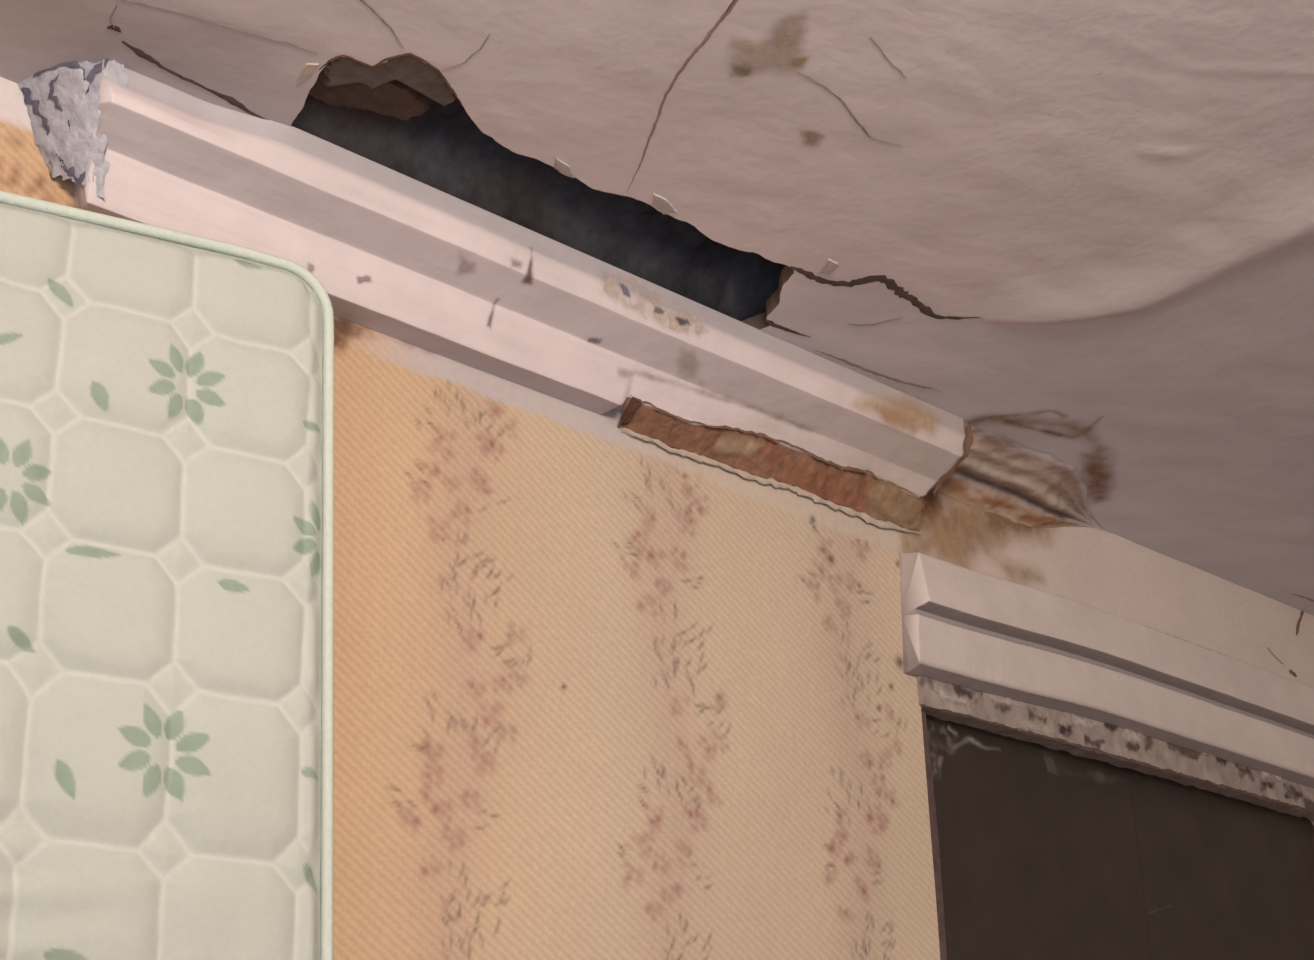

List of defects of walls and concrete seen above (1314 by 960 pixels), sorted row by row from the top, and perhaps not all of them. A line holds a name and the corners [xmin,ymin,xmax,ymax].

flaking render [18,58,128,200]
crack [107,0,317,120]
crack [360,0,404,49]
crack [442,34,490,70]
crack [627,0,738,191]
crack [798,71,901,145]
spalling [291,63,786,333]
crack [789,266,980,326]
crack [815,350,940,391]
flaking render [618,394,1112,535]
leakage [919,492,1031,562]
crack [1267,594,1314,677]